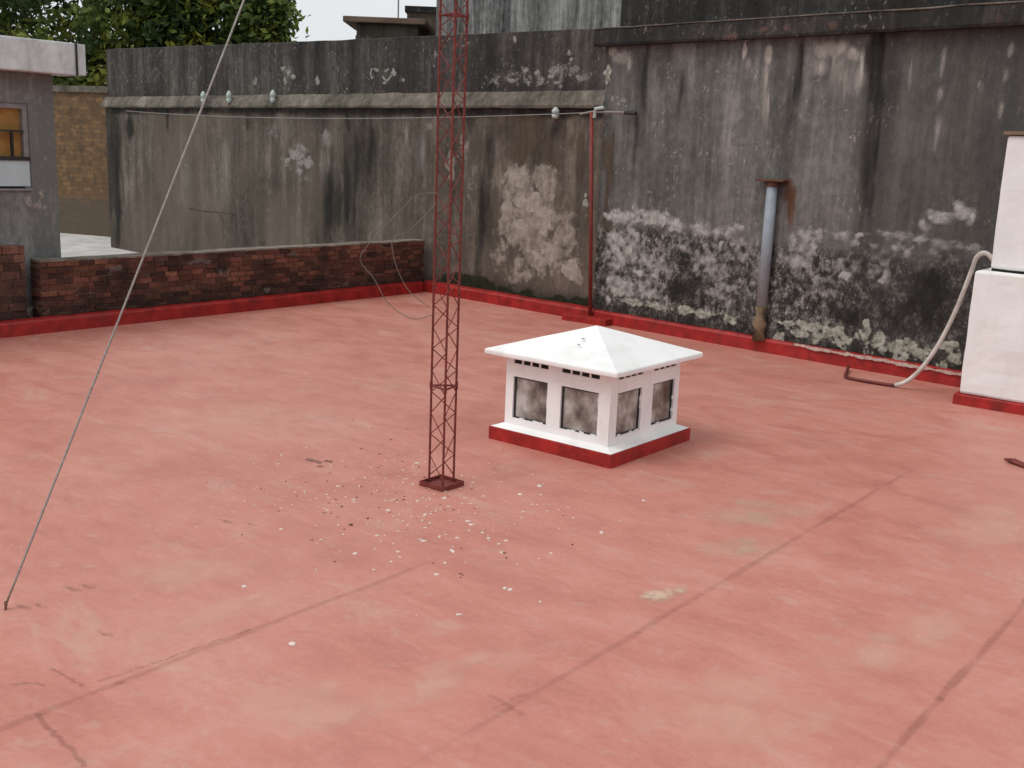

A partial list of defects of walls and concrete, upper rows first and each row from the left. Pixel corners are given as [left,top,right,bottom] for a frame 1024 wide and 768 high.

leakage [106,108,208,242]
leakage [317,108,366,126]
leakage [593,133,759,307]
leakage [780,226,980,293]